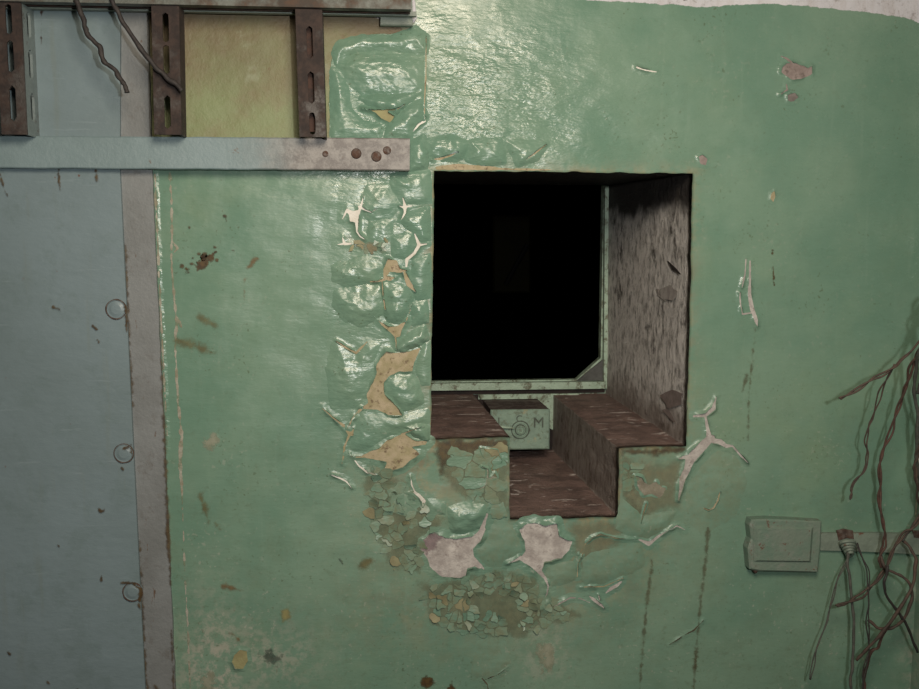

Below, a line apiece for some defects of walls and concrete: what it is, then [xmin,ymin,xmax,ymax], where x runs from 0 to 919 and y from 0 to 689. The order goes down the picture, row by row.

peeling [776,51,816,106]
rust [180,247,218,270]
peeling [734,254,762,331]
rust [162,405,171,569]
peeling [316,190,580,638]
peeling [623,390,753,504]
rust [121,572,158,689]